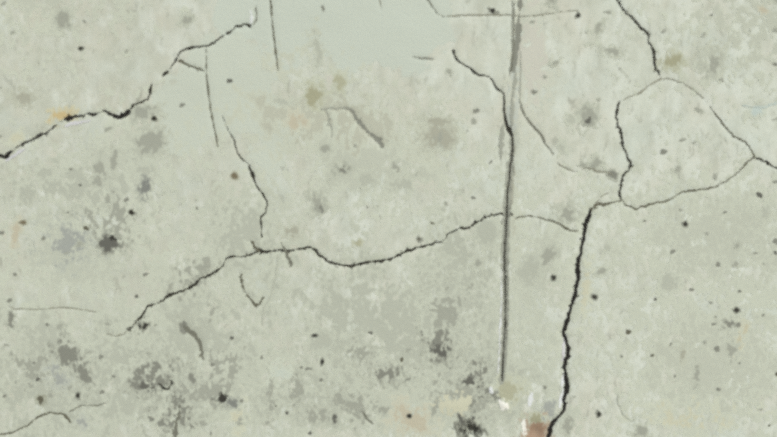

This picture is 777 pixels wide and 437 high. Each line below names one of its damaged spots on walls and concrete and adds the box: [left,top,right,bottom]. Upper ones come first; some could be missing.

crack [428,0,578,17]
crack [0,7,257,159]
crack [452,49,503,93]
crack [321,106,384,148]
crack [222,116,268,237]
crack [511,0,777,437]
crack [107,212,504,336]
crack [9,305,97,313]
crack [182,325,204,360]
crack [0,401,108,435]
crack [158,380,180,437]